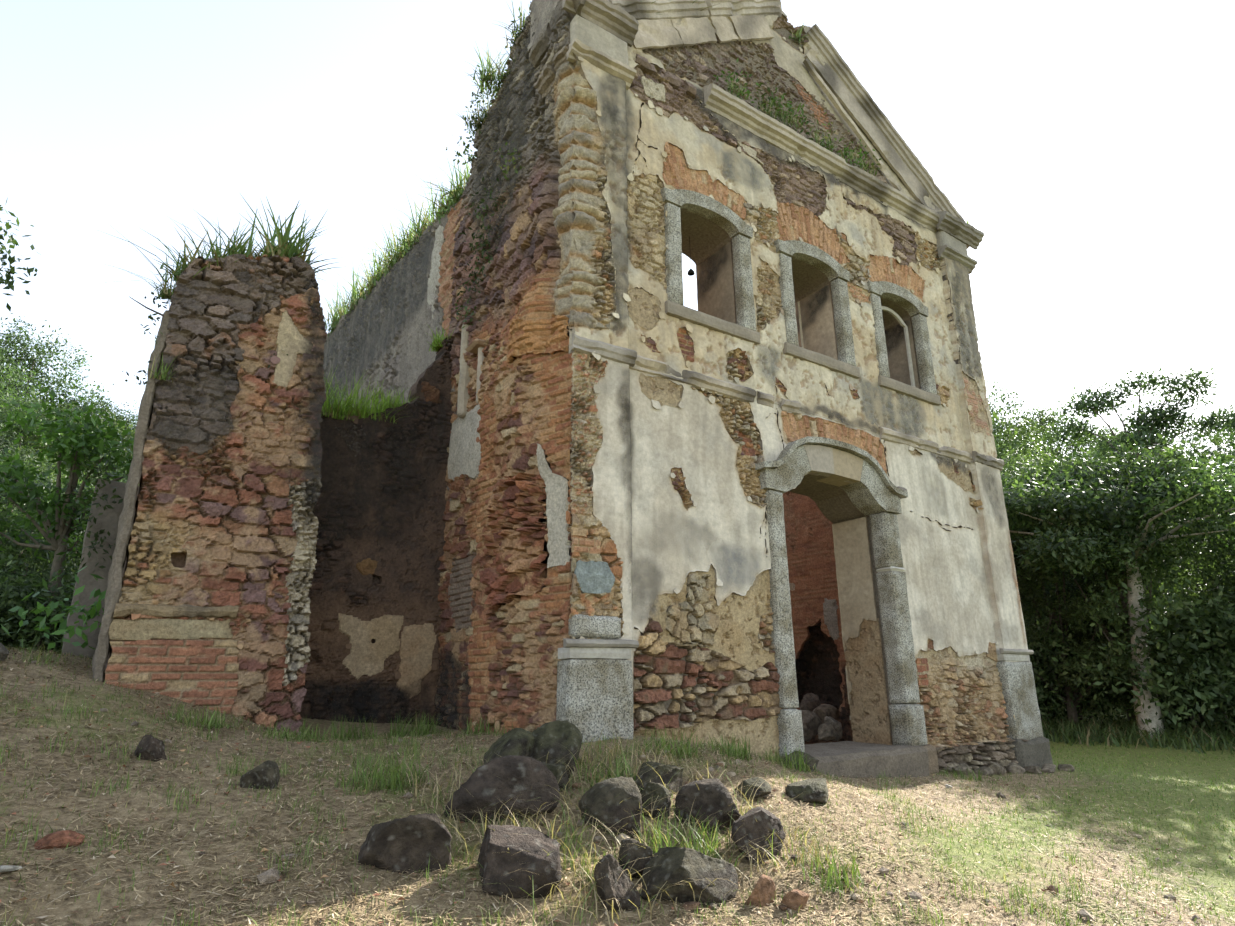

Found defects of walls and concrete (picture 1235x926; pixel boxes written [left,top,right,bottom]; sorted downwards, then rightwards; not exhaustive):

damp [618,380,630,433]
spalling [503,16,947,757]
flaking render [478,473,549,610]
spalling [915,642,1015,748]